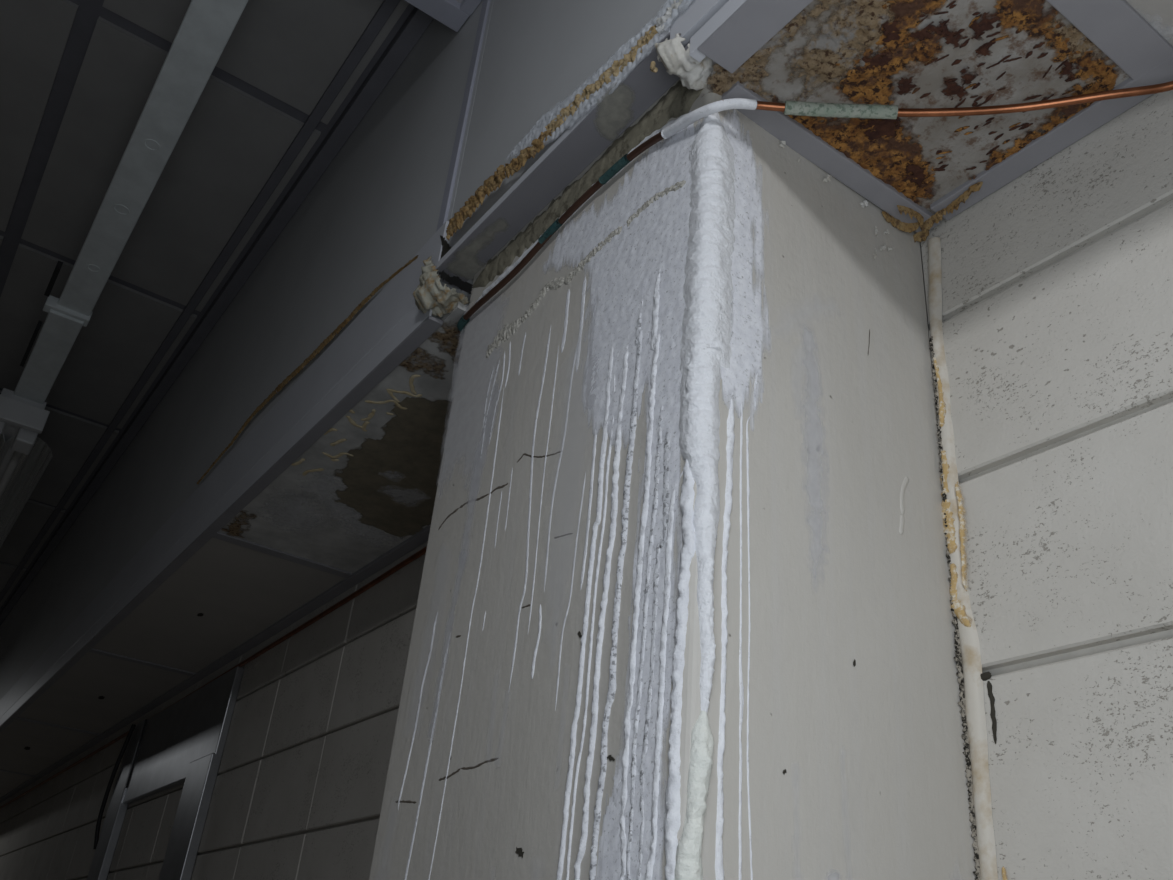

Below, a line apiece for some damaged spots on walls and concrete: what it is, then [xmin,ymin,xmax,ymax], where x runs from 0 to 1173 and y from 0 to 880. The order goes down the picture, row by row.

rust [706,0,1119,242]
leakage [271,375,452,543]
crack [439,758,499,781]